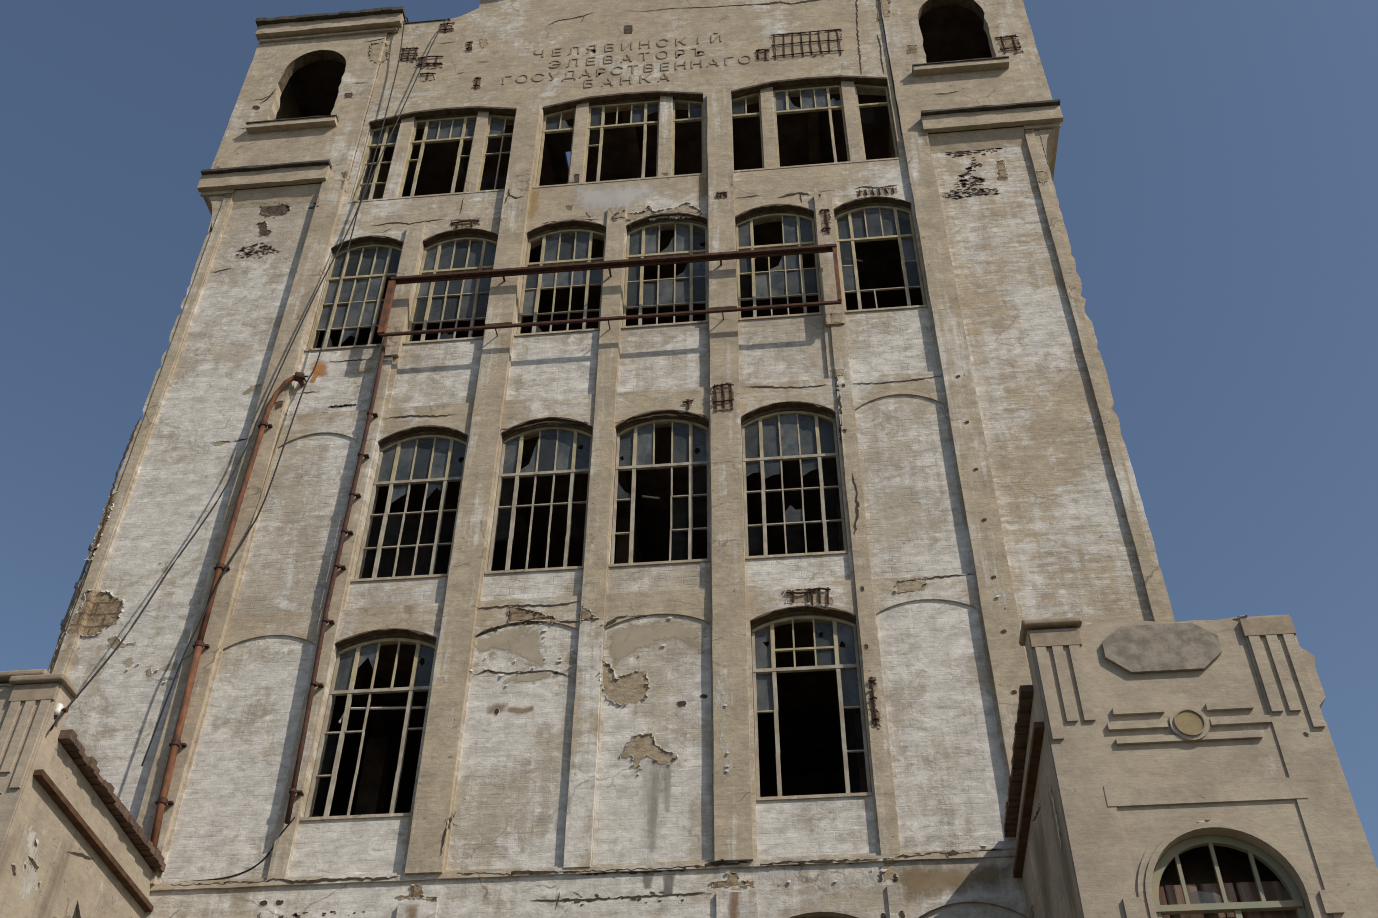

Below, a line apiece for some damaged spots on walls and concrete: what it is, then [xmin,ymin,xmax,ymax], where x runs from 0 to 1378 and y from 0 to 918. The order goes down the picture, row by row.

spalling [942,148,1008,200]
spalling [236,201,303,261]
corrosion [310,362,326,382]
spalling [65,589,179,682]
peeling [470,606,577,686]
spalling [578,609,600,620]
peeling [598,617,707,707]
spalling [619,732,678,775]